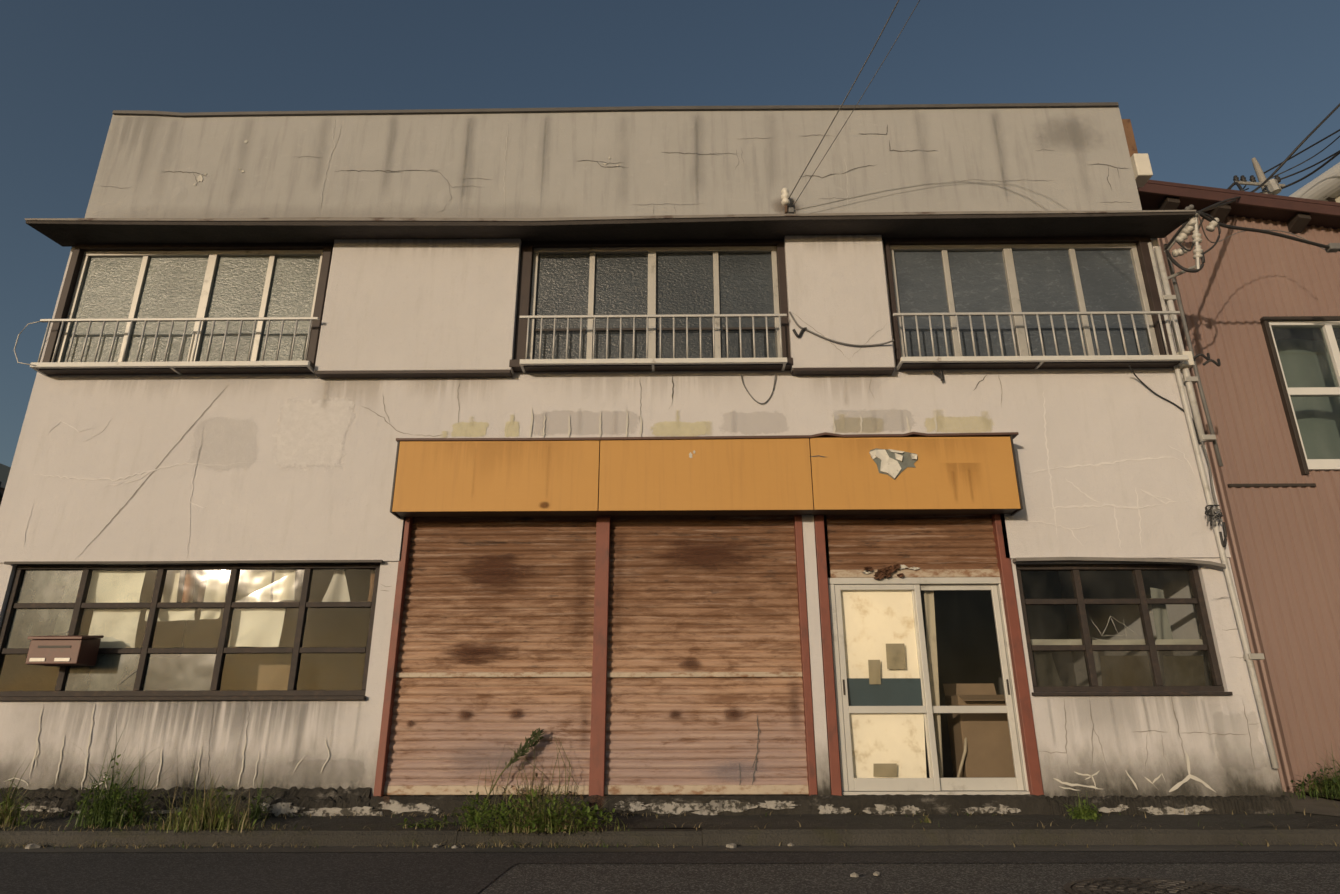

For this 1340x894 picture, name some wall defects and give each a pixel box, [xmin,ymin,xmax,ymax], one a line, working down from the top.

crack [799,125,936,212]
peeling [651,411,714,458]
crack [80,390,224,555]
corrosion [465,555,530,585]
corrosion [864,564,904,580]
corrosion [449,643,508,664]
crack [1038,699,1107,773]
crack [1136,696,1256,776]
spalling [254,799,442,816]
spalling [614,800,798,815]
spalling [817,804,927,815]
spalling [959,804,1021,814]